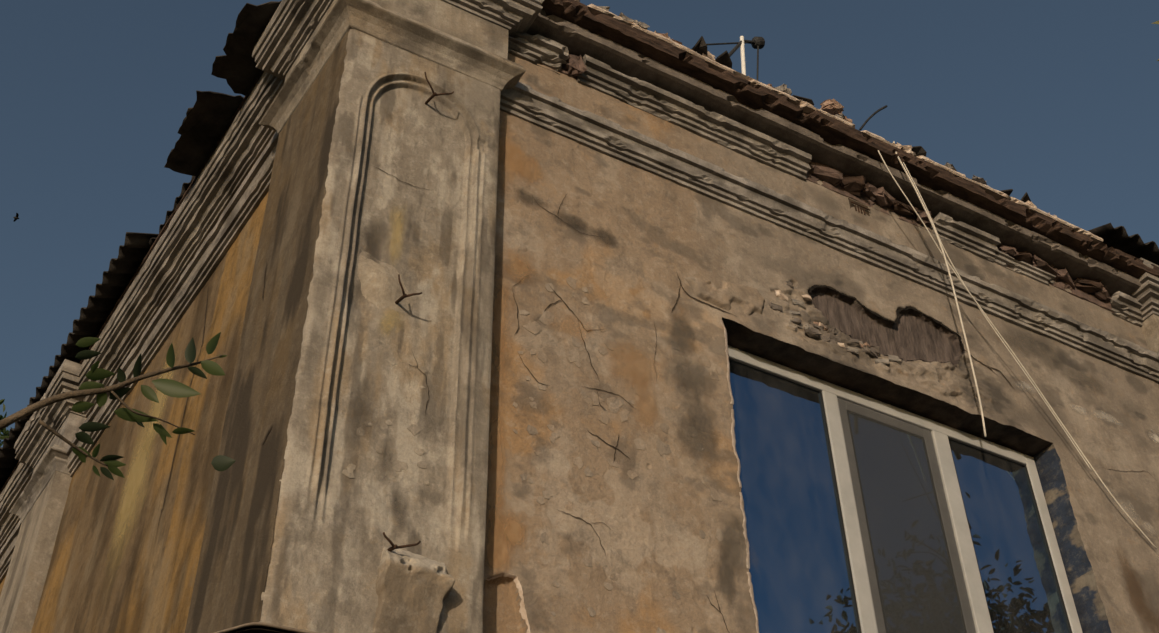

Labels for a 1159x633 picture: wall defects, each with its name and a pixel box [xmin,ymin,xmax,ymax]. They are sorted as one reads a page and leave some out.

flaking render [998,245,1111,302]
spalling [769,281,965,366]
spalling [720,320,759,633]
spalling [483,573,530,633]